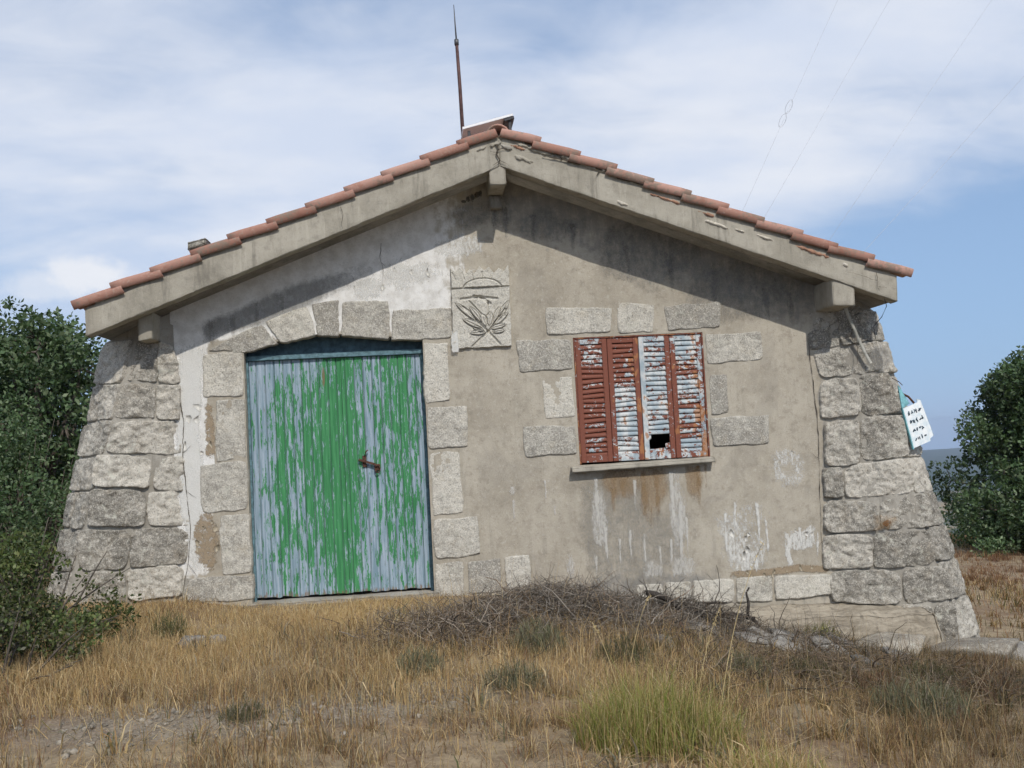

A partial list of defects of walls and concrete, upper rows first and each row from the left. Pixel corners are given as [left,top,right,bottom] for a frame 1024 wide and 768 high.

peeling [176,346,220,571]
leakage [592,471,693,576]